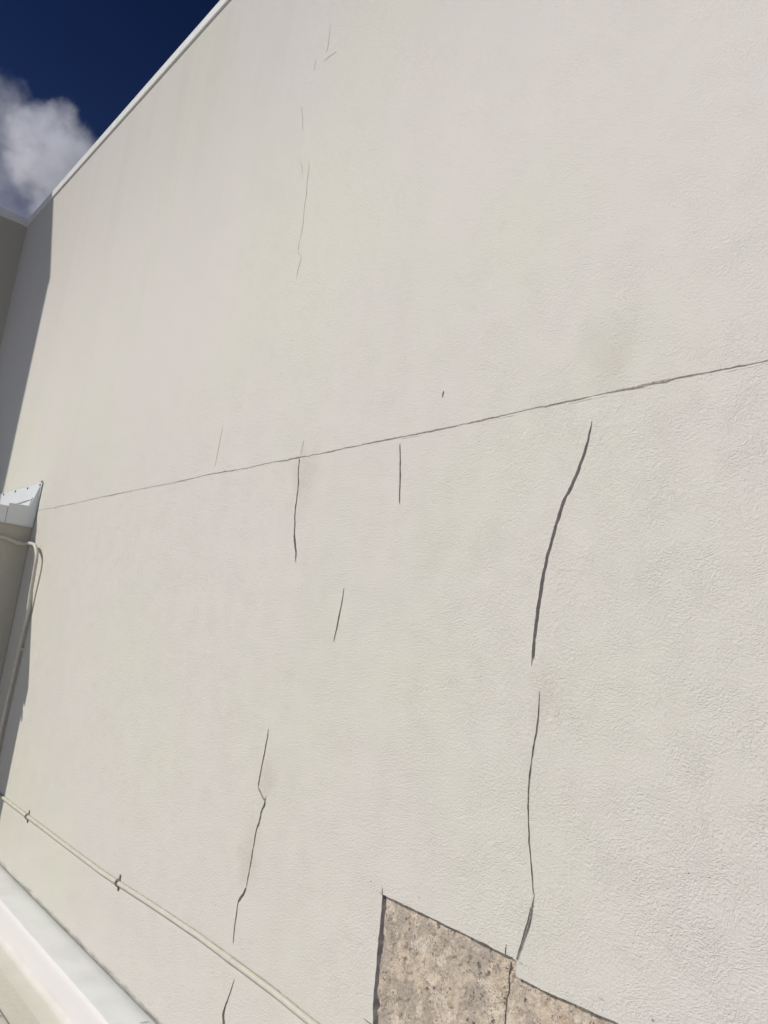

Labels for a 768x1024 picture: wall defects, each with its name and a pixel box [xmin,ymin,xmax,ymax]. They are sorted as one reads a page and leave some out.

crack [38,360,768,1024]
spalling [364,893,618,1024]